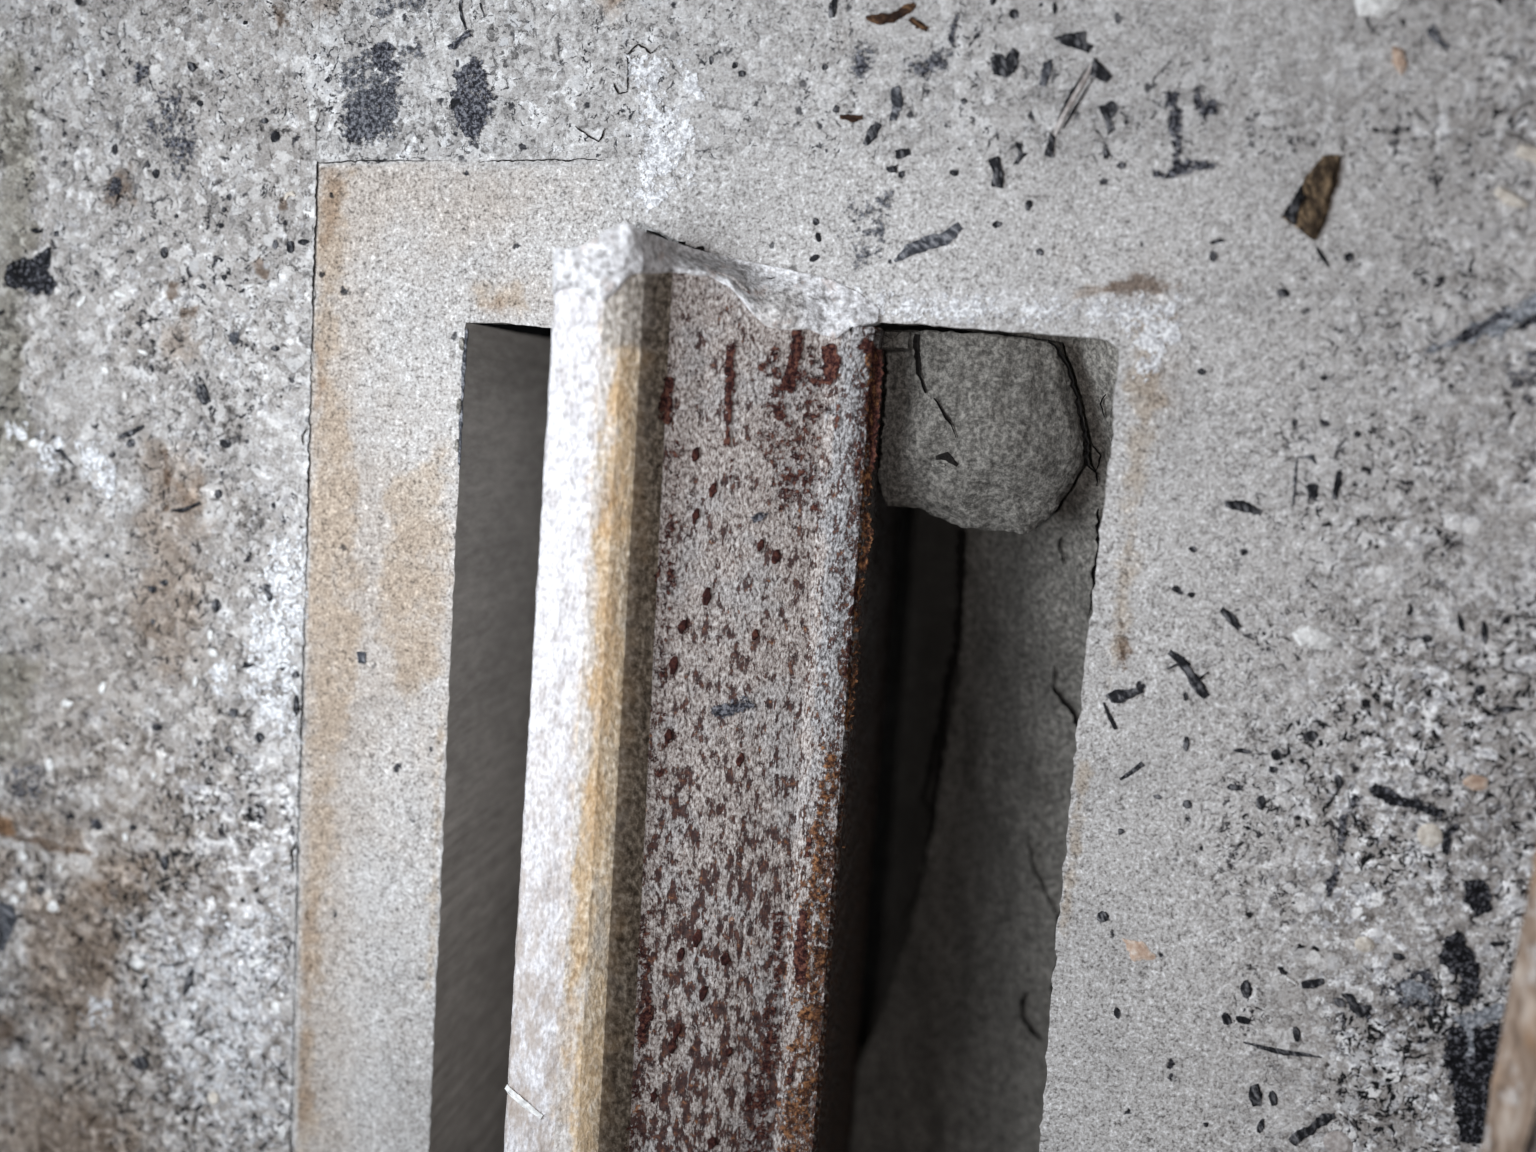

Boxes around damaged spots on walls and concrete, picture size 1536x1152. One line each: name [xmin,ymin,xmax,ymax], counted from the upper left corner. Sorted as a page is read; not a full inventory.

corrosion [647,377,684,789]
corrosion [717,330,884,731]
crack [1051,666,1078,727]
crack [1048,340,1114,616]
corrosion [624,903,653,1151]
corrosion [733,741,845,1152]
crack [1019,837,1060,1040]